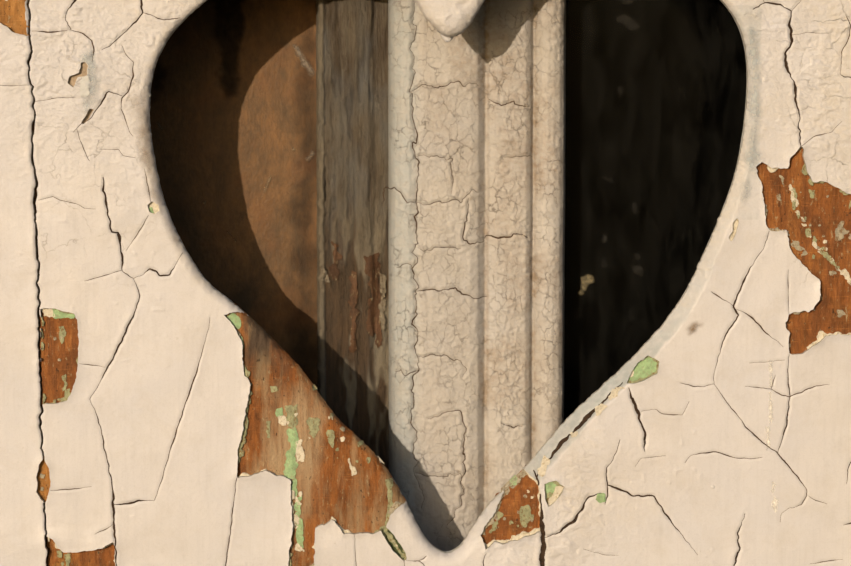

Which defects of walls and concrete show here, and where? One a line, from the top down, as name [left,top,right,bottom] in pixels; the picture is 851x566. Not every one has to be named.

peeling [0,0,30,38]
crack [754,0,840,146]
crack [840,14,851,78]
crack [0,0,210,566]
crack [383,7,528,525]
peeling [756,147,851,354]
peeling [39,308,79,405]
peeling [47,537,115,566]
peeling [225,307,407,566]
peeling [481,455,564,549]
peeling [595,356,659,416]
crack [533,233,829,566]